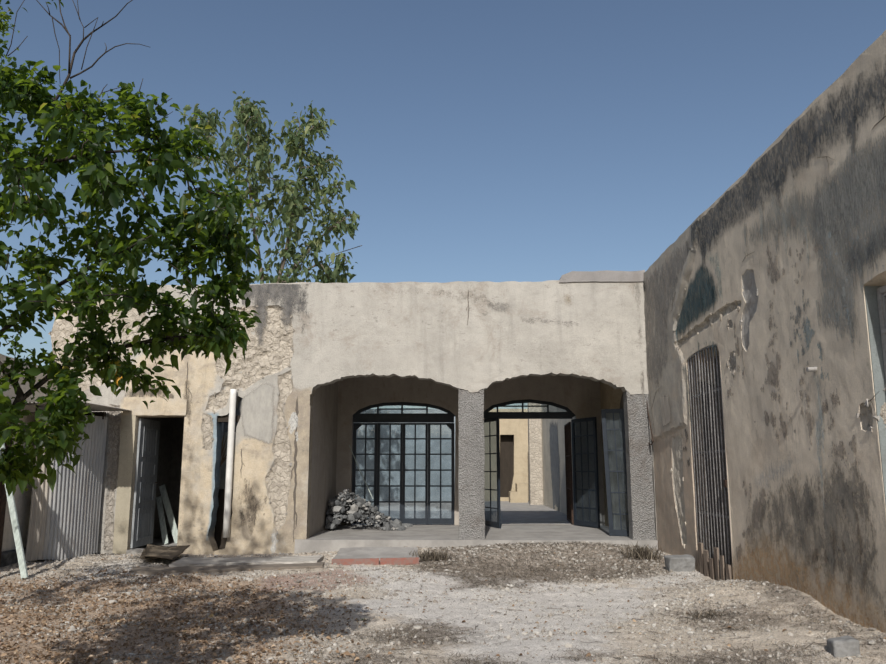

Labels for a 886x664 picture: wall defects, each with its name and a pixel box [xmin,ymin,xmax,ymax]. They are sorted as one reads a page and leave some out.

leakage [637,65,886,405]
spalling [201,305,299,553]
spalling [674,237,840,450]
leakage [747,392,878,605]
spalling [830,399,886,466]